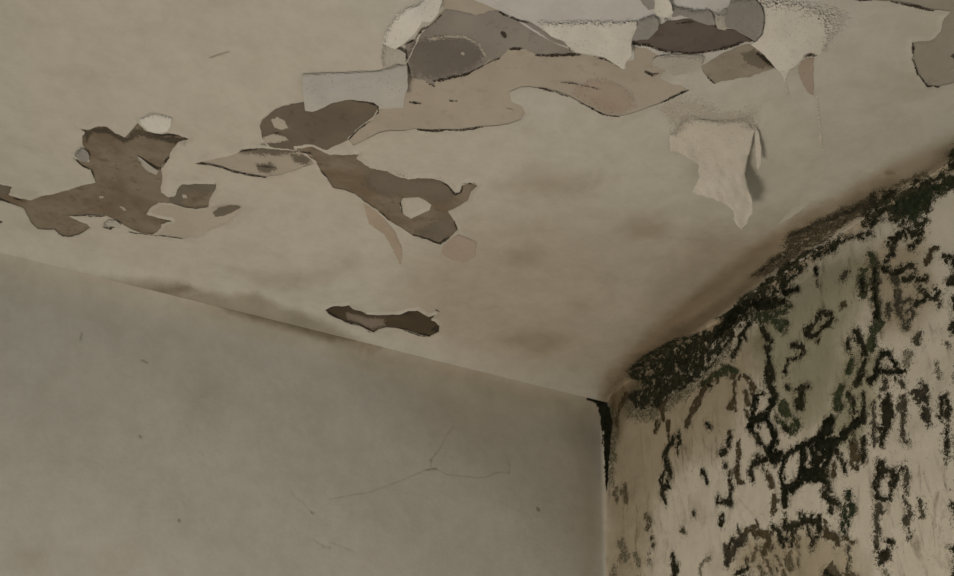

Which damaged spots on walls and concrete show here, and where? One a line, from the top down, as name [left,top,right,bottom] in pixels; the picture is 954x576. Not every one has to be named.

peeling [0,0,954,264]
peeling [322,302,443,339]
mould [586,143,954,576]